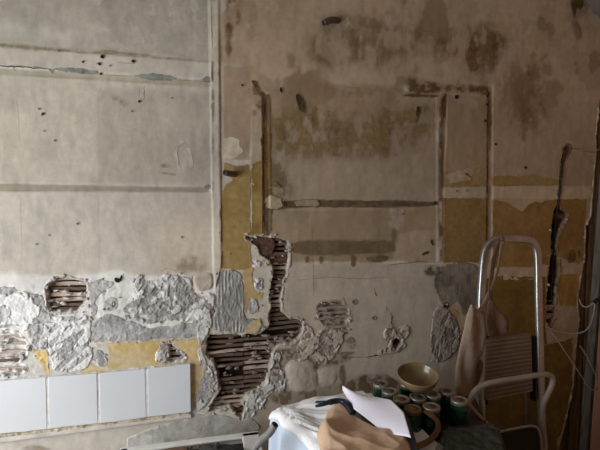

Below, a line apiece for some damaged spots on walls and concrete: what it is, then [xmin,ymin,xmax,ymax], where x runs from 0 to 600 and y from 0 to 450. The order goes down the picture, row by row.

damp [571,0,584,17]
damp [467,31,504,70]
damp [271,110,426,157]
spalling [0,161,348,423]
peeling [430,99,600,450]
spalling [372,325,412,357]